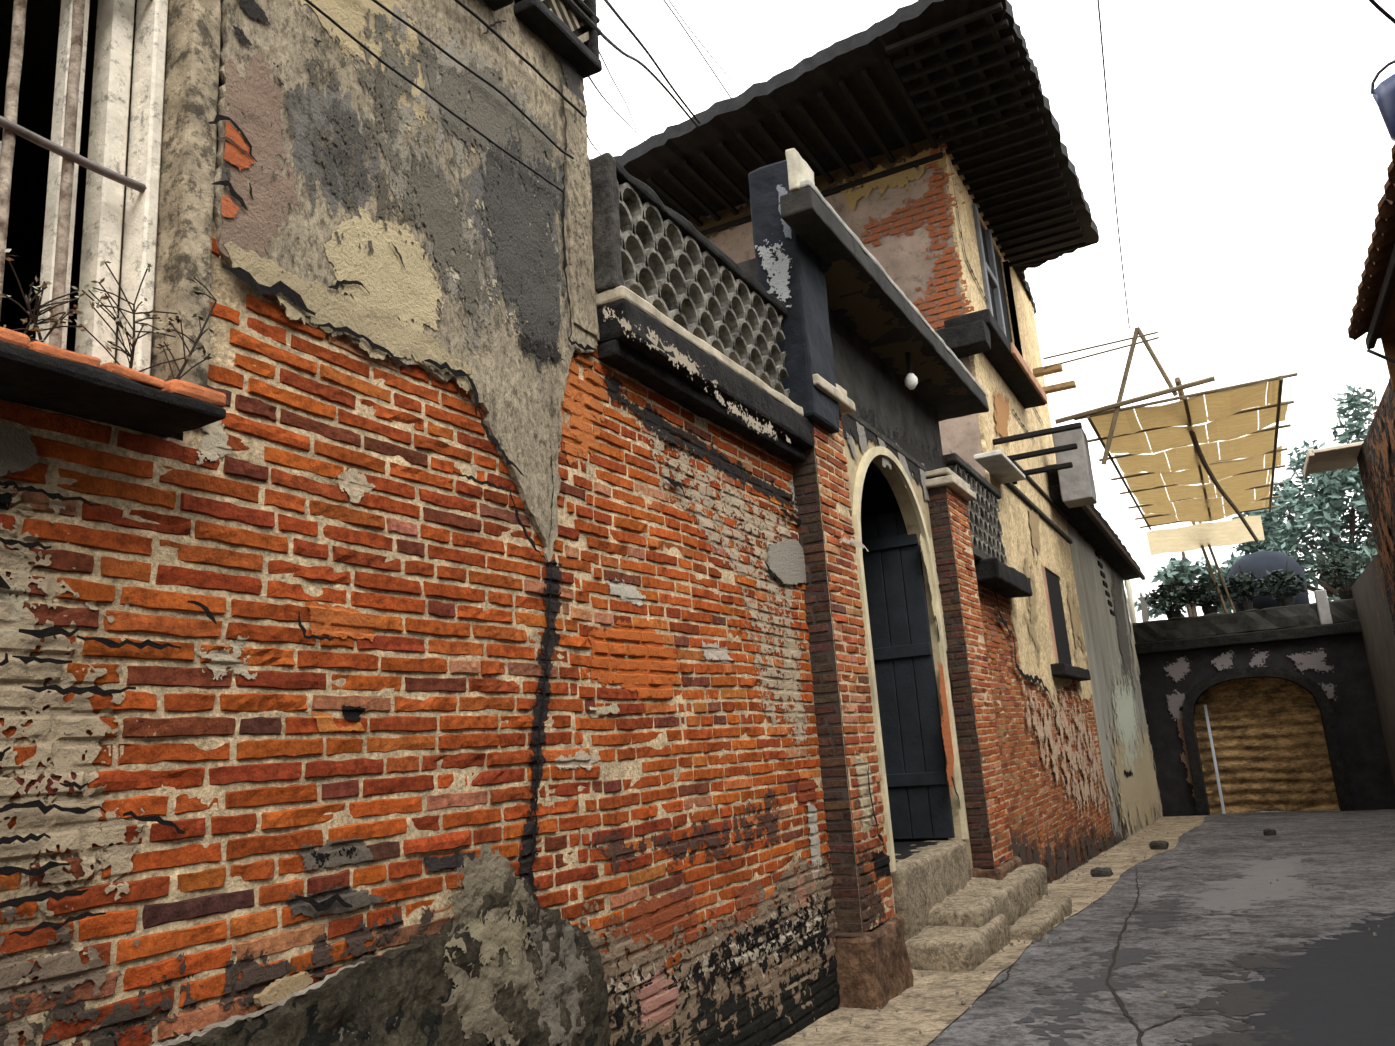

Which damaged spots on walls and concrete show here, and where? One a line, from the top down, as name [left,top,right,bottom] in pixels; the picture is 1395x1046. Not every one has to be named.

spalling [231,0,271,46]
peeling [298,0,442,132]
spalling [221,195,239,218]
spalling [224,122,254,170]
spalling [857,134,974,331]
peeling [224,206,609,468]
peeling [603,307,791,444]
crack [222,263,554,889]
peeling [1164,656,1192,721]
peeling [1211,648,1269,671]
peeling [1287,648,1337,701]
leakage [0,899,439,1046]